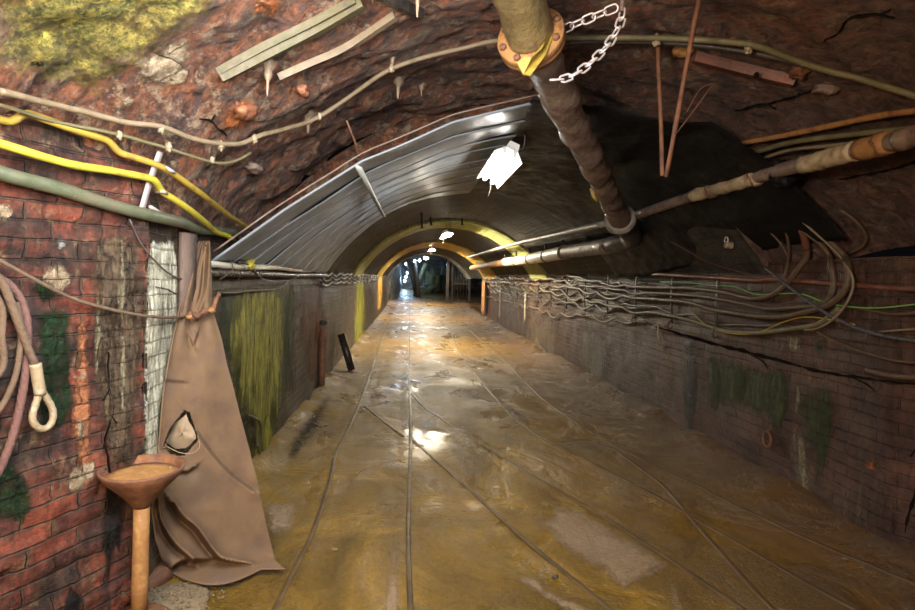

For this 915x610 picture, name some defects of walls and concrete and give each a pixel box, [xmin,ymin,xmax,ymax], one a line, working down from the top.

water stain [47,356,69,417]
water stain [219,284,295,451]
crack [655,326,915,392]
crack [905,490,915,532]